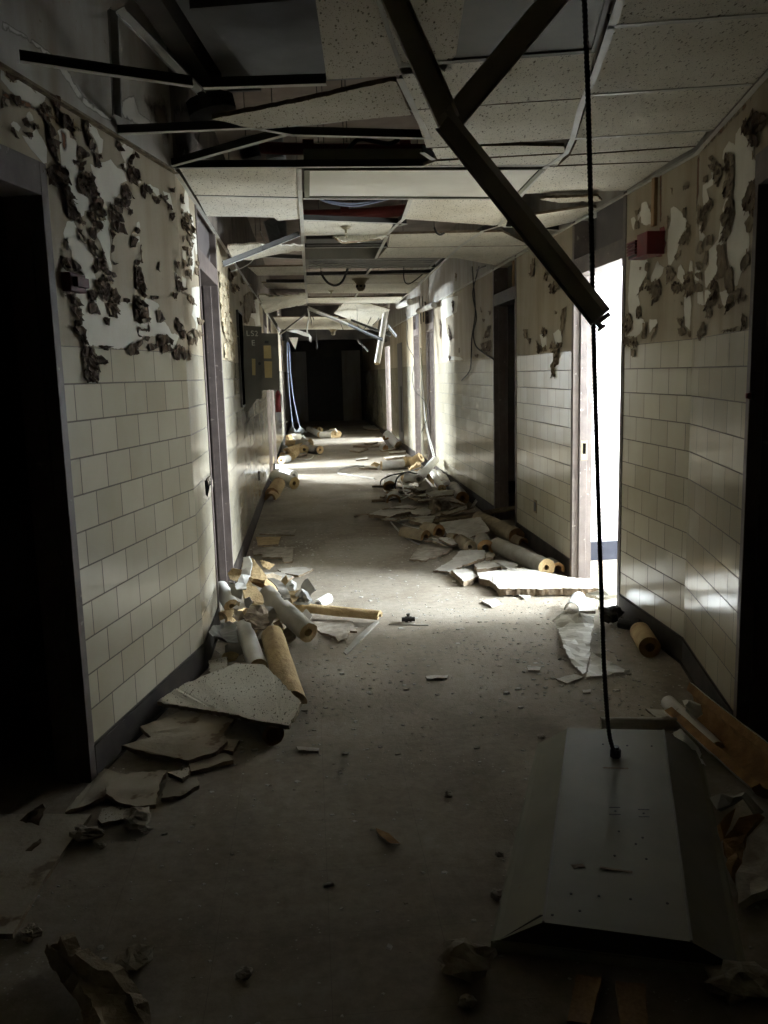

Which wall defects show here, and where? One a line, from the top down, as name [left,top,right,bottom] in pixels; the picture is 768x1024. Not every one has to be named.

peeling [1,69,205,383]
peeling [523,307,566,379]
peeling [621,108,767,358]